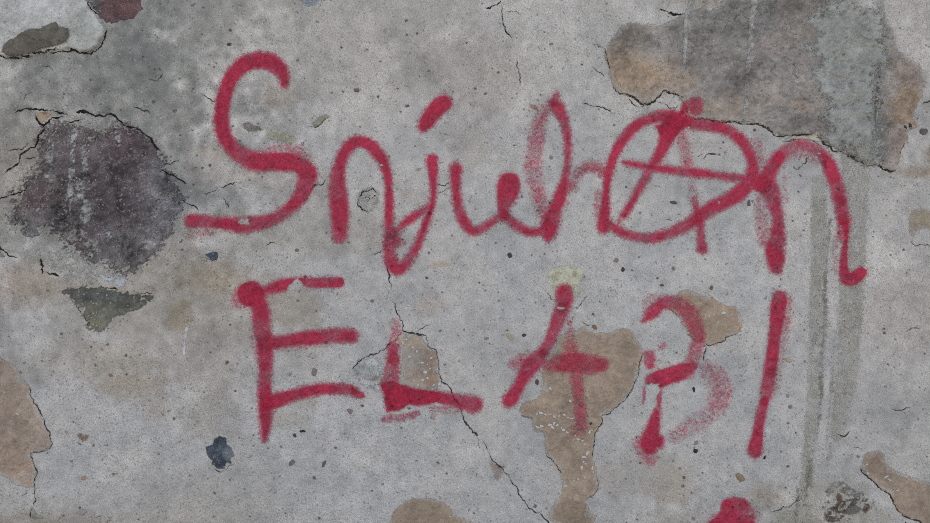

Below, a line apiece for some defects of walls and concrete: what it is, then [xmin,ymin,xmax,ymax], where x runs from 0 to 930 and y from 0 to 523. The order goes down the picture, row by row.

flaking render [87,0,143,24]
peeling [605,0,927,172]
water stain [42,129,126,286]
flaking render [8,111,186,277]
crack [6,93,240,225]
spalling [62,285,154,332]
peeling [668,290,743,346]
peeling [0,357,52,488]
peeling [390,498,472,523]
crack [336,250,549,523]
peeling [520,327,643,523]
peeling [860,451,930,523]